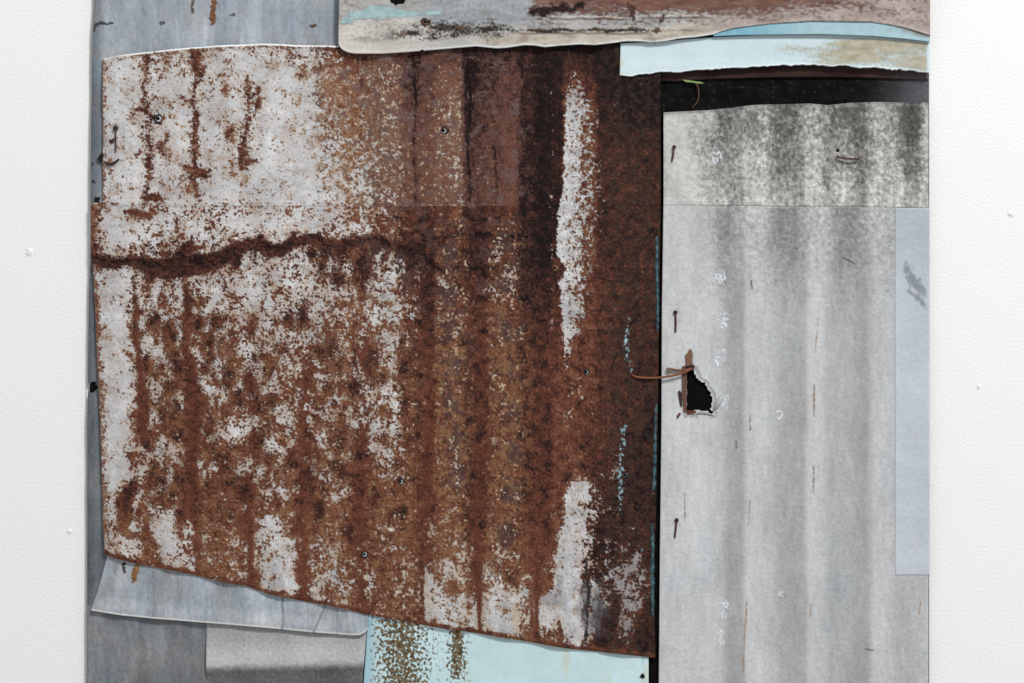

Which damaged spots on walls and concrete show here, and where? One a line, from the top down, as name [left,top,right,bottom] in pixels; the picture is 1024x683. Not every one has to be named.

rust [528,0,872,33]
rust [91,45,661,683]
spalling [683,362,723,418]